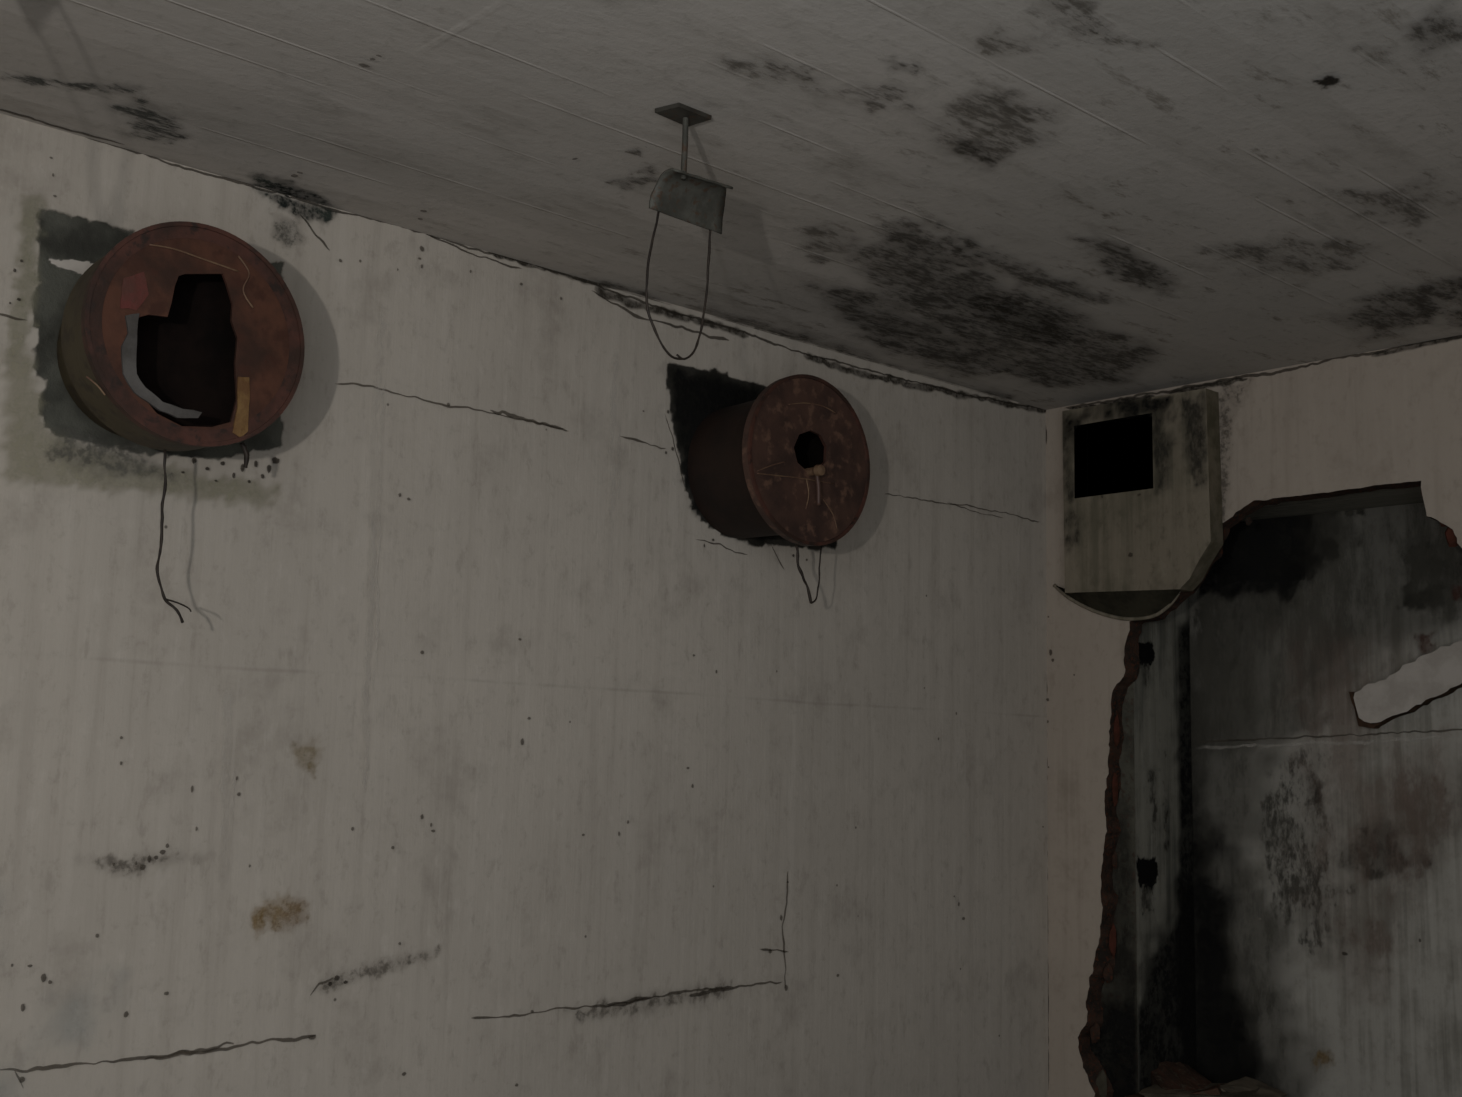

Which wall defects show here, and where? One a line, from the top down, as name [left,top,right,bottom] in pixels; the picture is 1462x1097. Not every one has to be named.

damp [954,97,1048,163]
crack [0,109,1462,442]
damp [726,223,1167,399]
damp [1348,278,1462,338]
crack [621,410,665,449]
damp [1063,397,1462,1097]
spalling [1078,481,1459,1097]
crack [473,872,789,1020]
crack [0,1035,316,1083]